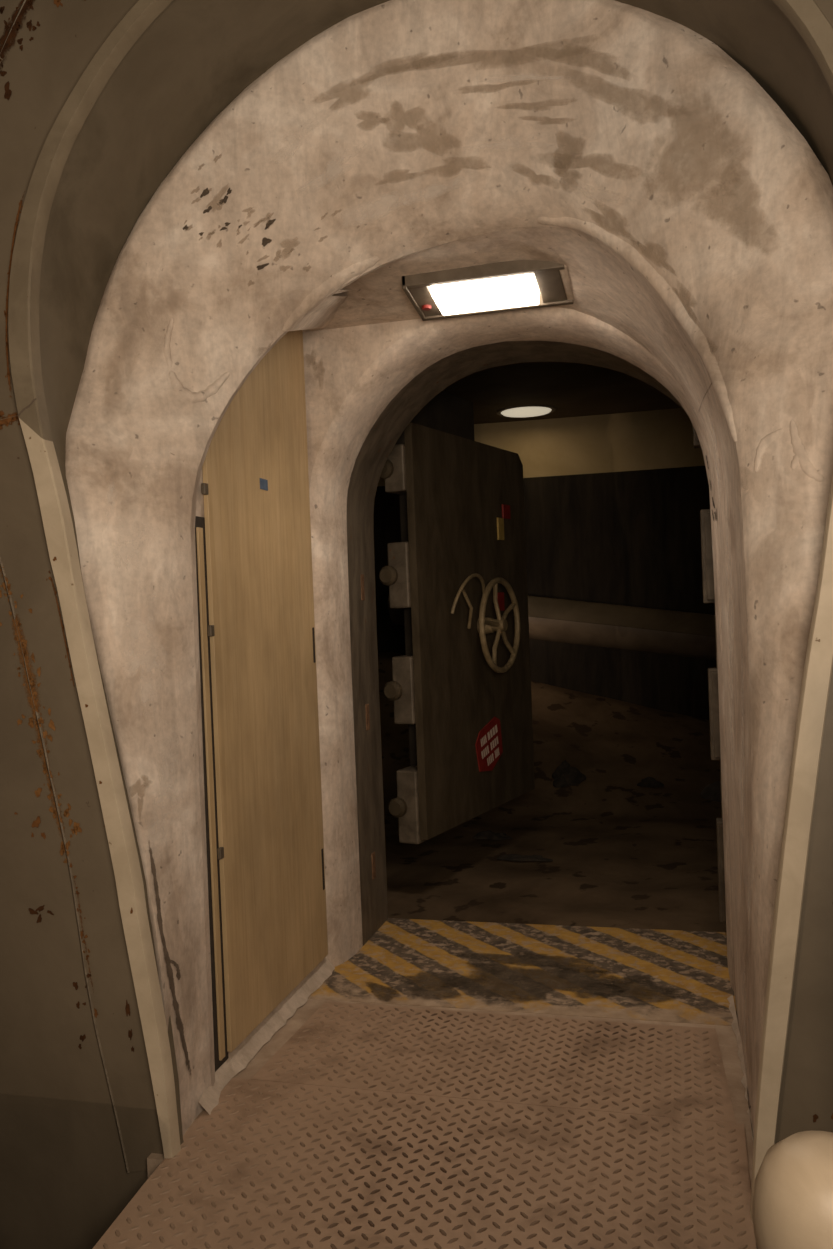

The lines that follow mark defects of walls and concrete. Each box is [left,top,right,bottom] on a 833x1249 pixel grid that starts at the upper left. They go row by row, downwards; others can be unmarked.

rust [0,0,40,100]
spalling [200,188,232,214]
rust [0,566,98,1018]